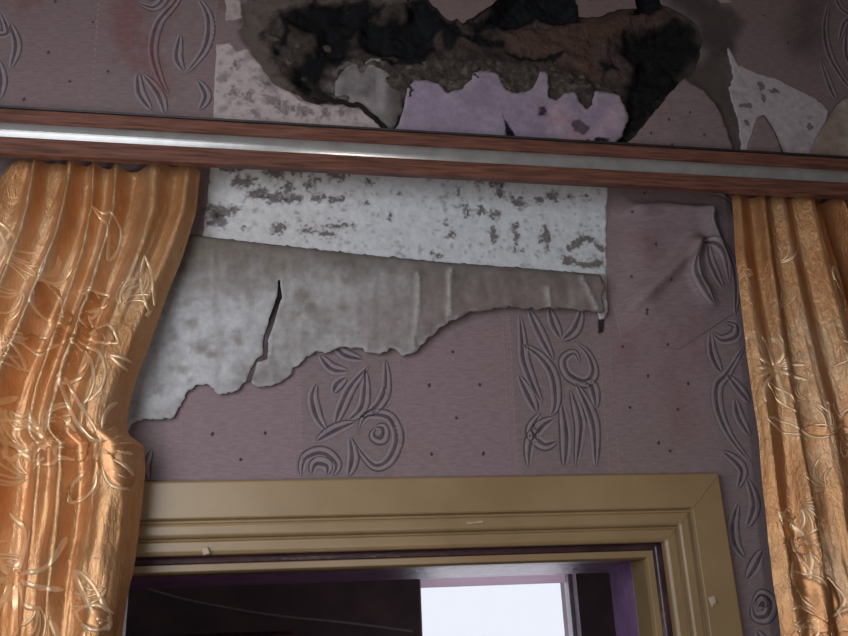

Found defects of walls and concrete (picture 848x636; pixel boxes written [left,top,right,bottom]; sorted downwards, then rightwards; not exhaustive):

spalling [213,0,703,143]
flaking render [727,47,848,156]
peeling [127,167,608,431]